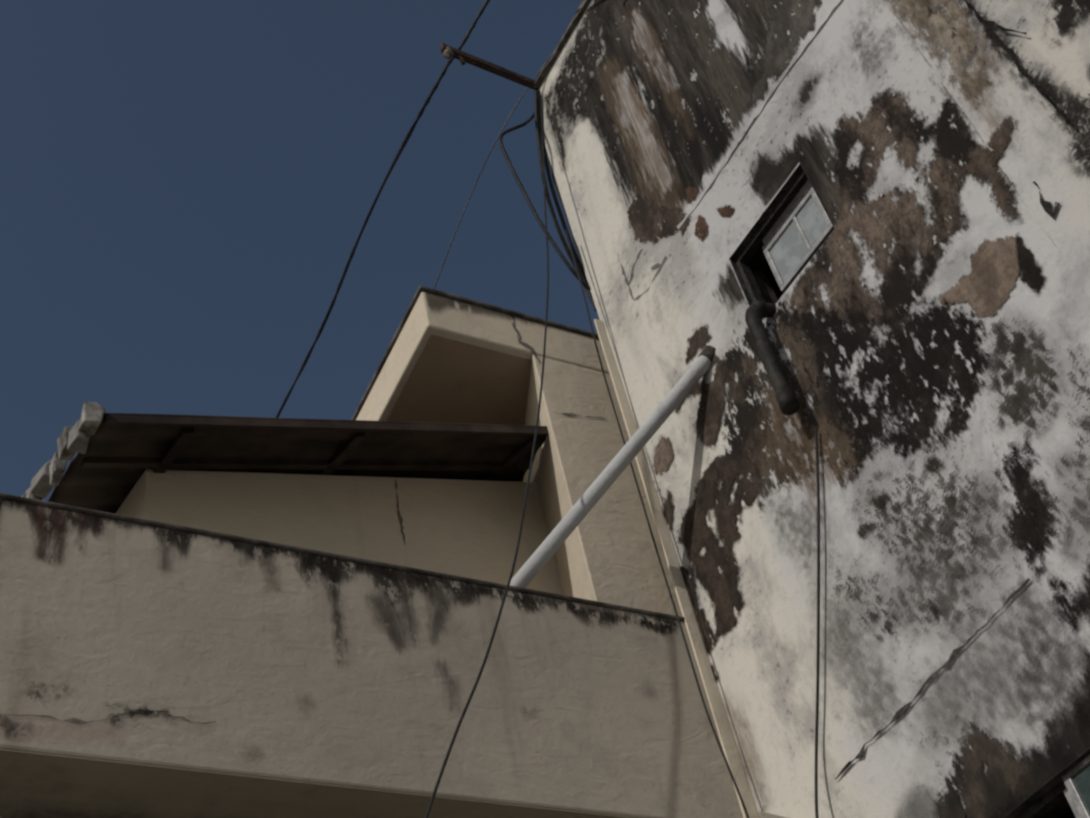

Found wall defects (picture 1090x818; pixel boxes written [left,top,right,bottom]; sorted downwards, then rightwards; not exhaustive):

leakage [544,0,774,211]
leakage [750,126,852,263]
peeling [780,87,1020,330]
leakage [1032,181,1060,219]
leakage [719,265,744,308]
peeling [938,235,1046,318]
crack [511,314,541,364]
crack [554,411,606,419]
leakage [0,498,197,567]
leakage [716,295,1090,737]
leakage [215,537,676,662]
crack [0,708,216,724]